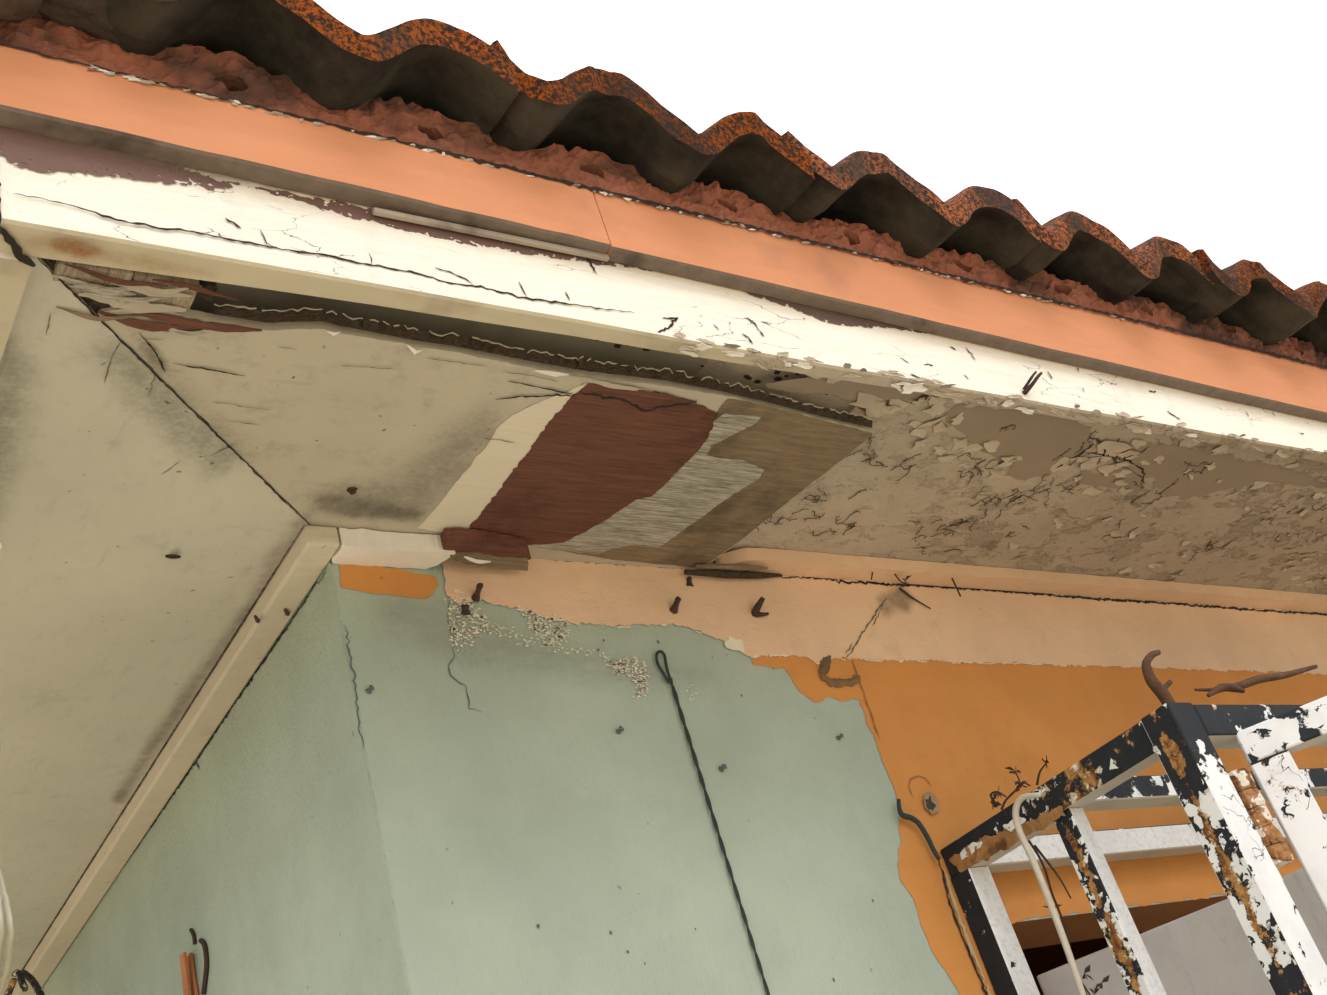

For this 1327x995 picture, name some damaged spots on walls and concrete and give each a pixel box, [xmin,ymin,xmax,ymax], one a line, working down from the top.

peeling [87,65,166,86]
peeling [183,89,324,126]
peeling [0,126,651,271]
crack [0,43,1327,369]
peeling [746,292,927,334]
peeling [418,384,764,554]
peeling [673,332,1327,516]
crack [1057,437,1148,483]
crack [0,183,678,971]
peeling [444,589,650,701]
spalling [924,792,940,815]
rust [949,806,1066,872]